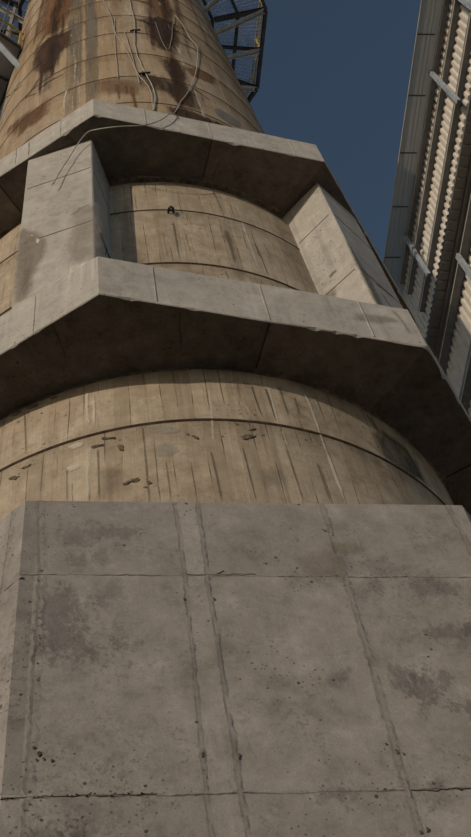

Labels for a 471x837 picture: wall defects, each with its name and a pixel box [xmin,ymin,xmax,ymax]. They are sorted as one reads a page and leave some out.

rust [25,0,72,98]
rust [140,0,223,125]
rust [7,103,47,134]
leakage [375,433,425,482]